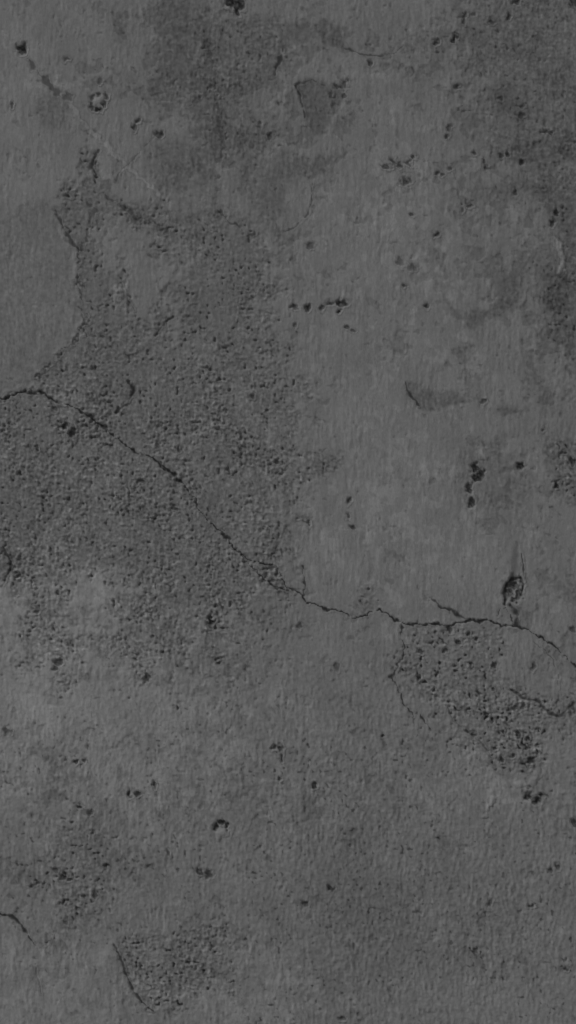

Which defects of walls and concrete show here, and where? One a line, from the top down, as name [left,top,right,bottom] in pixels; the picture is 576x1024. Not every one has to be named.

crack [0,377,576,733]